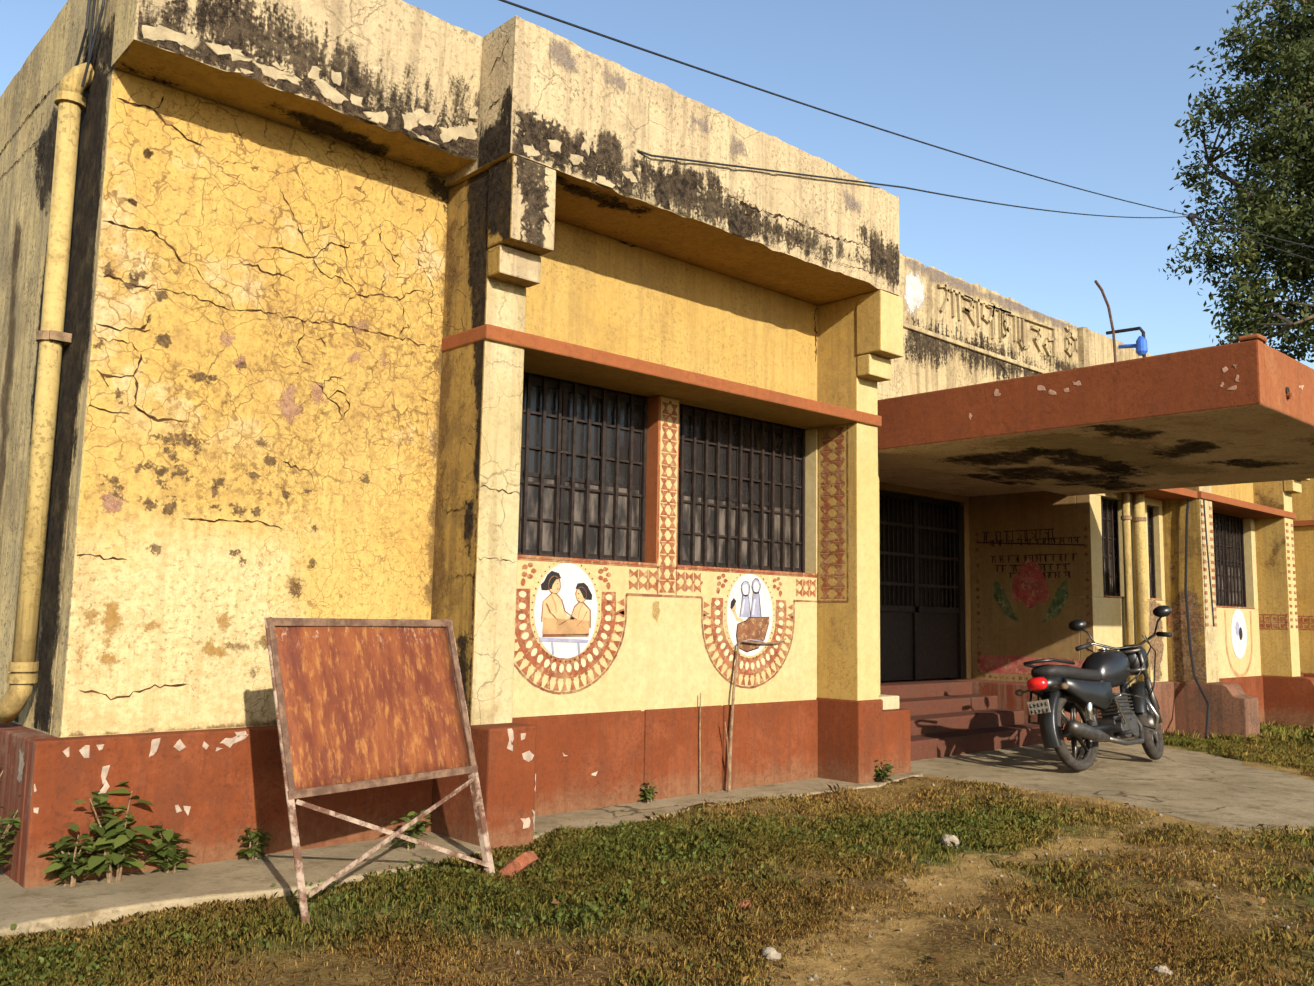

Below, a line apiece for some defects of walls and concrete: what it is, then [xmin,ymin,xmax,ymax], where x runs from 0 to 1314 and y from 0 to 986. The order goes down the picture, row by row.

crack [118,96,206,148]
peeling [141,24,478,155]
crack [89,190,439,422]
leakage [15,48,180,732]
leakage [137,0,1076,723]
spalling [99,430,205,516]
leakage [940,424,1304,491]
crack [78,553,127,561]
crack [183,518,282,529]
peeling [62,744,110,794]
peeling [149,738,186,757]
peeling [202,731,249,751]